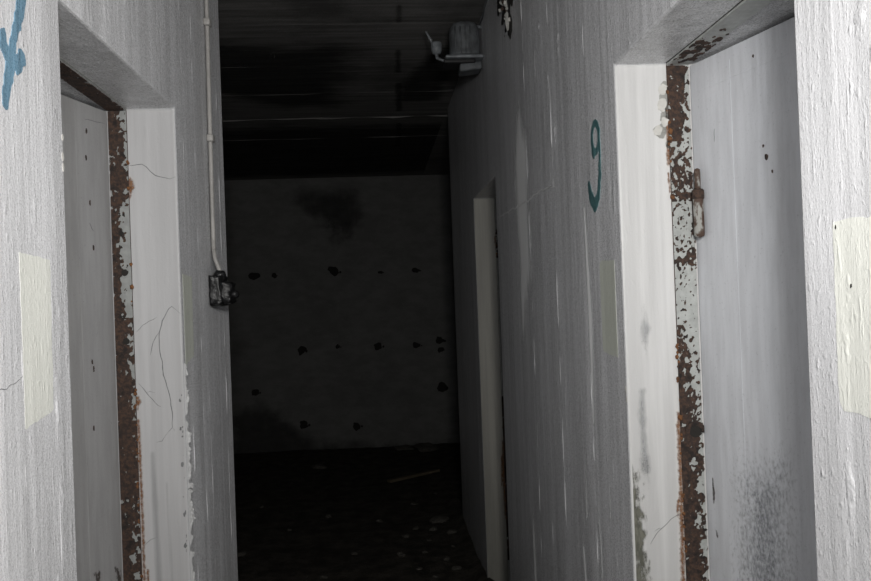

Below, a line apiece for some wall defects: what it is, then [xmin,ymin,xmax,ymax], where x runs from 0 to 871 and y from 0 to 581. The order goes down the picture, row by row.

rust [60,61,149,581]
peeling [653,81,670,147]
rust [666,28,729,581]